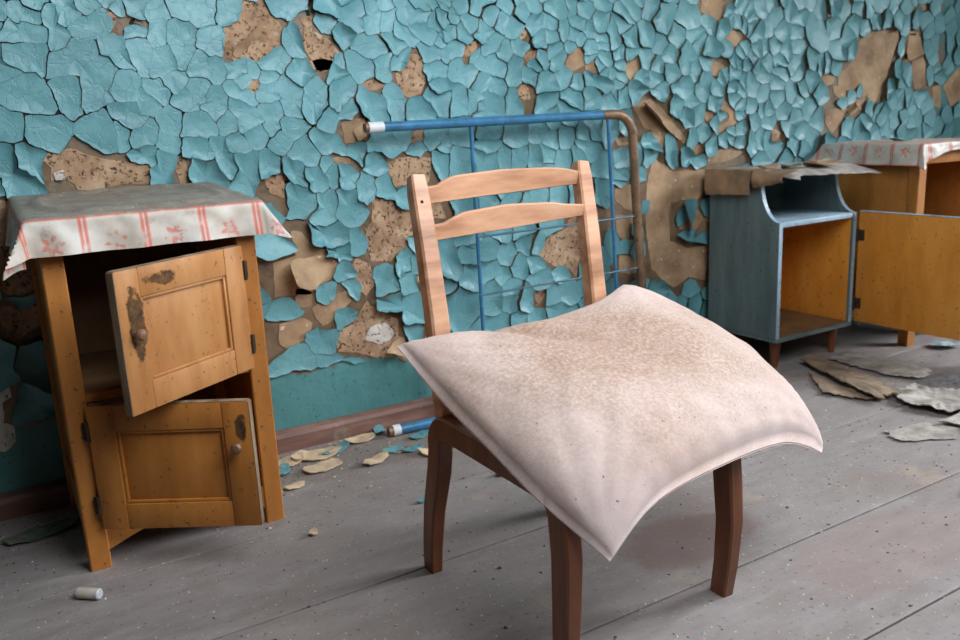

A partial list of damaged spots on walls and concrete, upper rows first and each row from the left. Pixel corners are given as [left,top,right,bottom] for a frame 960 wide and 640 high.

crack [0,0,370,228]
crack [260,286,272,321]
peeling [0,0,802,452]
crack [305,0,708,332]
peeling [809,0,960,148]